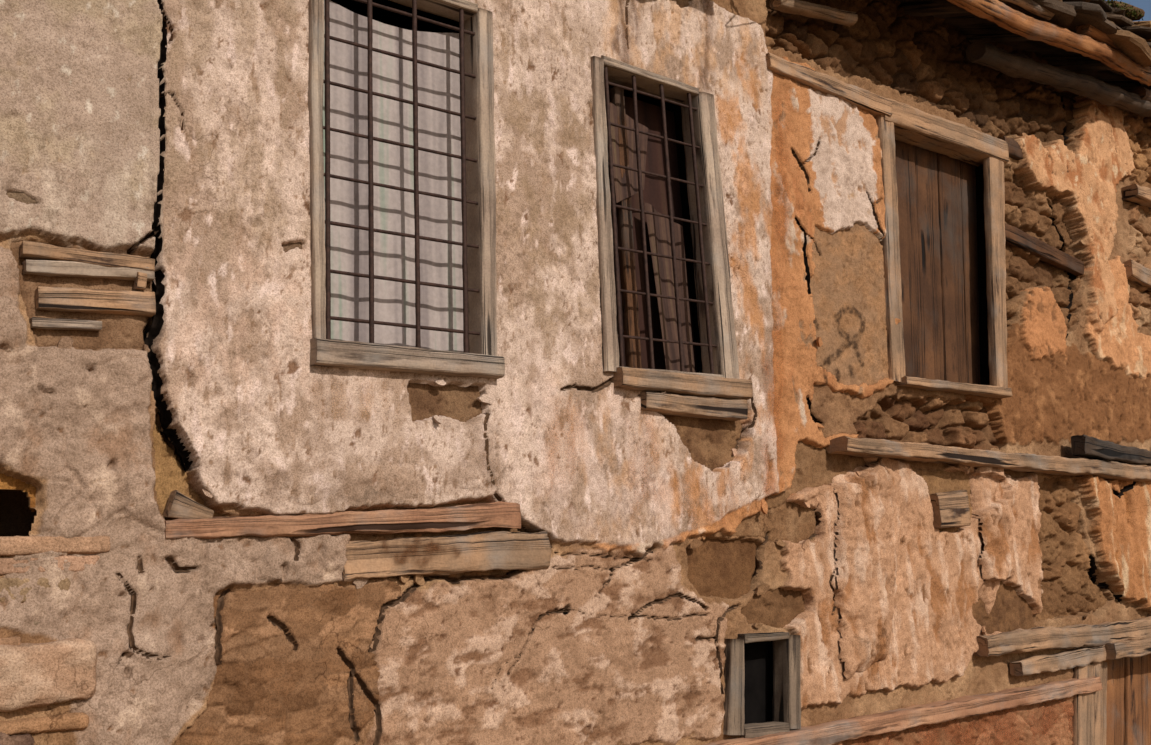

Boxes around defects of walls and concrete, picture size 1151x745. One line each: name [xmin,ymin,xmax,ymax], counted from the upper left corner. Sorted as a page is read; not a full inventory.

crack [127,0,193,472]
crack [795,218,819,294]
spalling [1004,163,1086,257]
spalling [407,379,495,424]
spalling [663,415,742,472]
spalling [686,223,999,628]
spalling [0,473,37,536]
crack [117,556,197,661]
crack [215,589,231,664]
spalling [174,569,511,745]
crack [336,569,519,745]
crack [610,592,738,694]